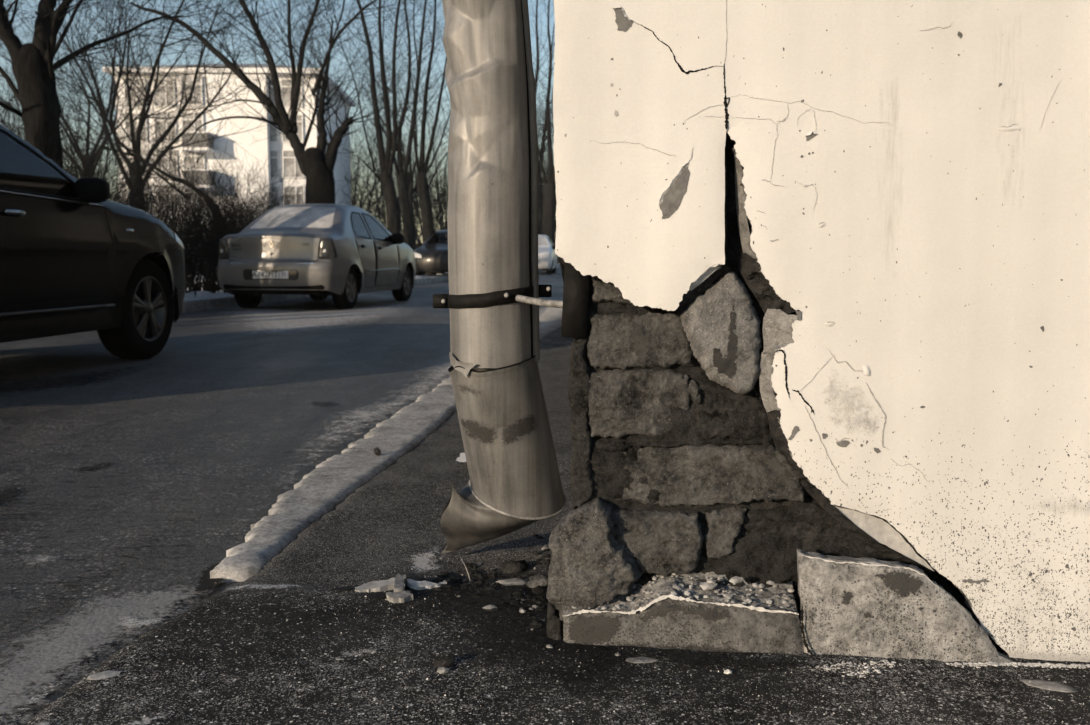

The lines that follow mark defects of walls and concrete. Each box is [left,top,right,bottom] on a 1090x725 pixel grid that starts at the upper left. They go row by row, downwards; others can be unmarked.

spalling [613,6,633,32]
crack [591,140,693,168]
crack [636,0,895,207]
spalling [546,137,976,640]
crack [776,349,848,487]